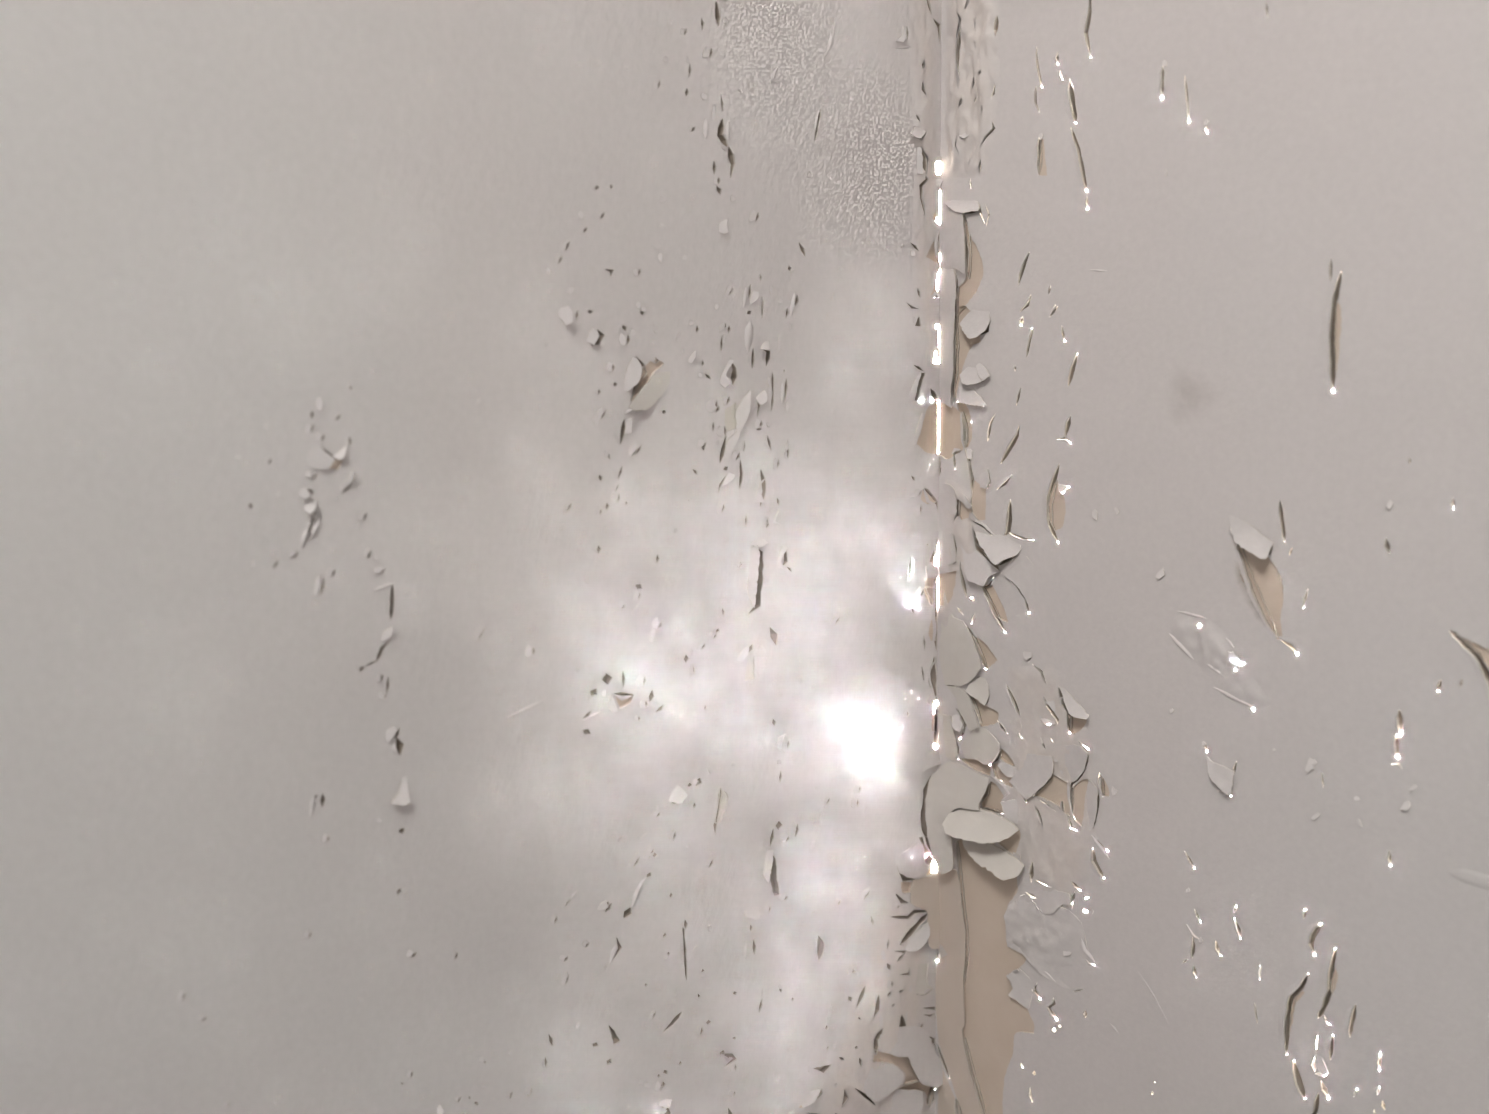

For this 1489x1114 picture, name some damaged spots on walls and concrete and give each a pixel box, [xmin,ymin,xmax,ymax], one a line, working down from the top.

peeling [663,0,735,201]
peeling [277,397,362,557]
peeling [558,287,670,554]
peeling [676,262,799,528]
peeling [579,670,664,738]
peeling [737,606,783,681]
peeling [777,546,791,574]
flaking render [788,0,1117,1114]
peeling [1201,741,1237,796]
peeling [1227,515,1300,655]
peeling [1448,630,1489,703]
peeling [1289,1055,1329,1114]